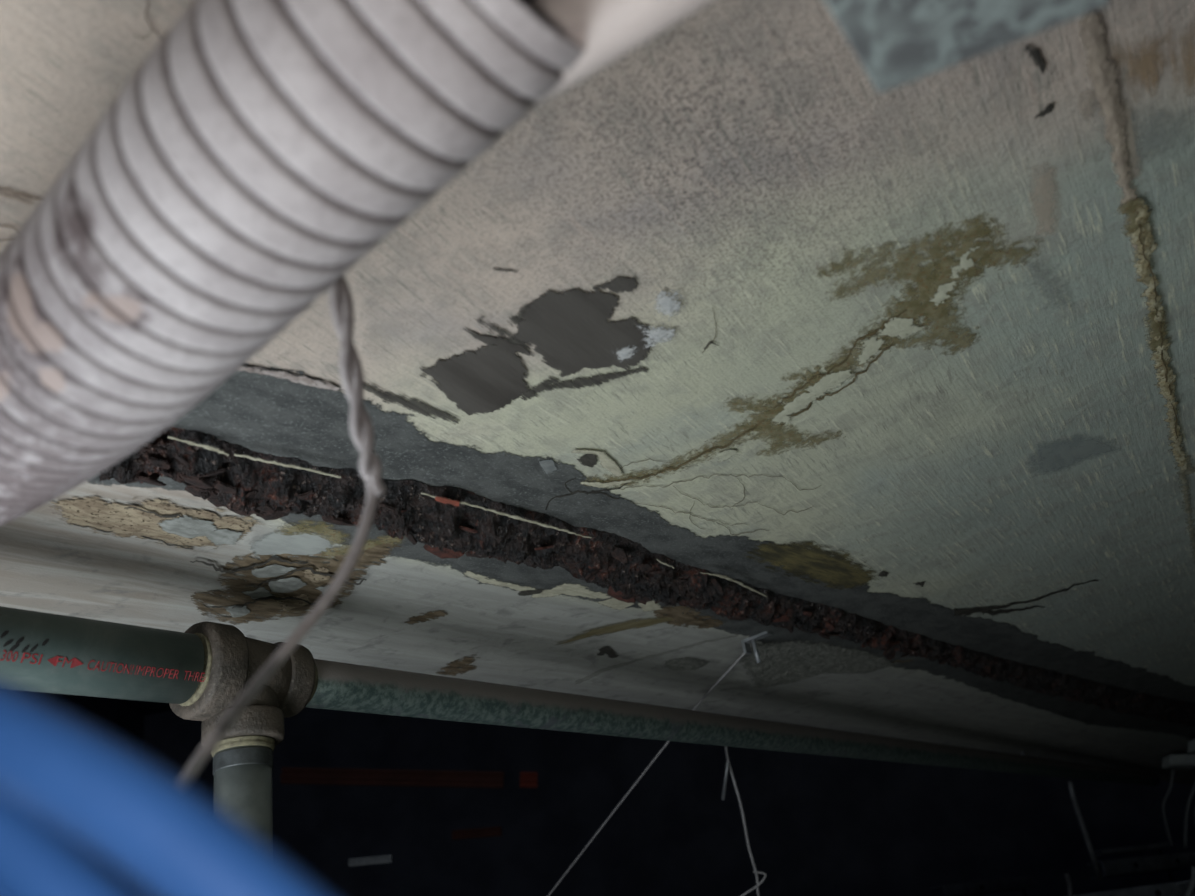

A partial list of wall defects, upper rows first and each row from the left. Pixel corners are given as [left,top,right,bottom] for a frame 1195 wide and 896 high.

efflorescence [616,290,682,360]
crack [703,307,719,352]
crack [1079,12,1195,558]
peeling [50,474,1195,739]
corrosion [99,427,1195,727]
peeling [170,277,1195,703]
crack [954,580,1099,616]